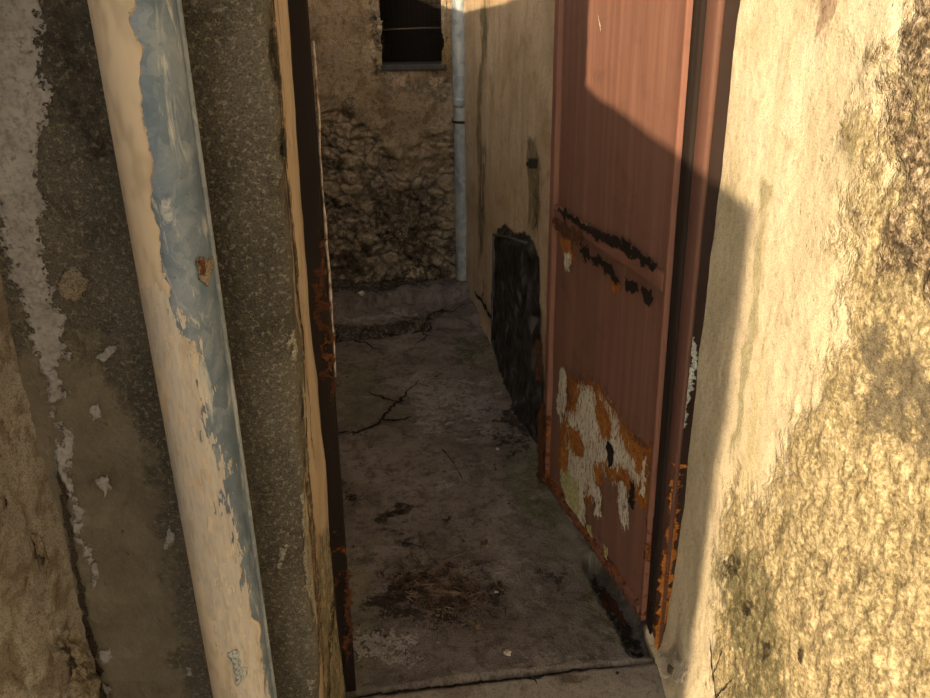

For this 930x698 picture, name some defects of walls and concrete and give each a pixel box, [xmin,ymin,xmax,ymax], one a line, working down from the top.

leakage [51,0,115,163]
corrosion [552,207,657,274]
leakage [894,236,919,277]
peeling [0,0,99,593]
crack [335,283,491,354]
peeling [95,345,120,362]
peeling [88,403,101,421]
crack [338,380,419,433]
corrosion [536,364,658,514]
peeling [95,475,112,499]
peeling [164,528,175,550]
corrosion [651,454,688,650]